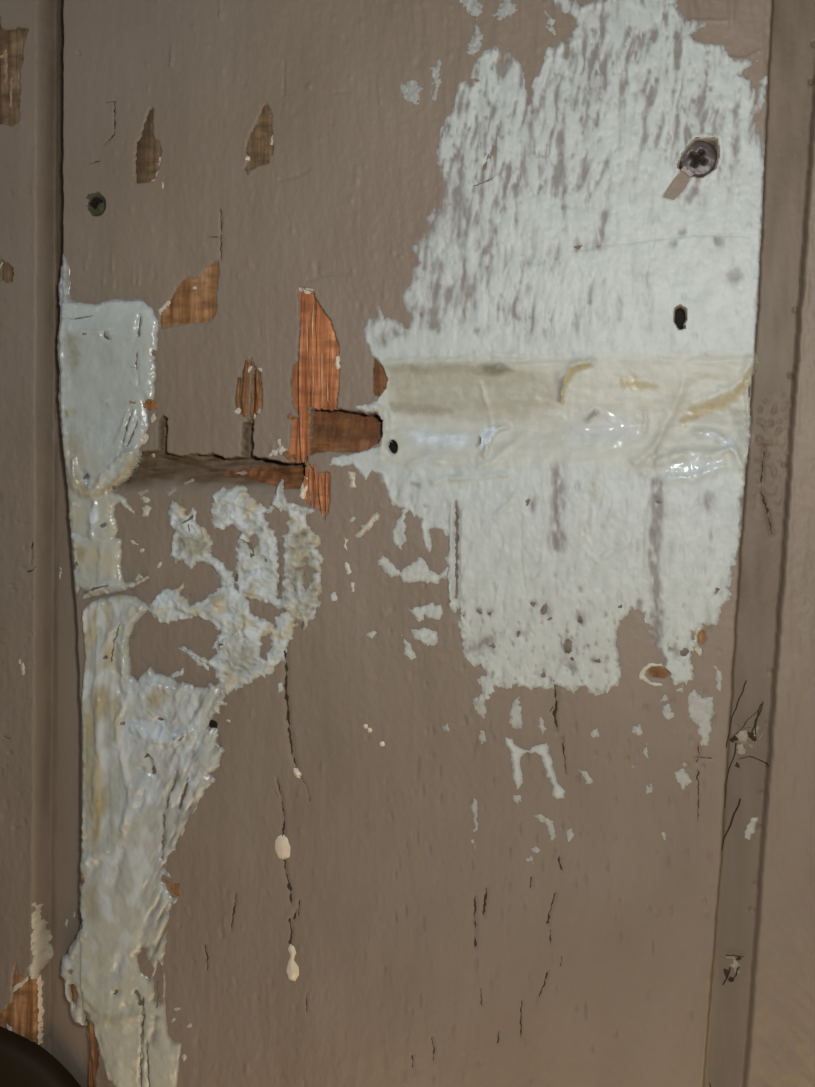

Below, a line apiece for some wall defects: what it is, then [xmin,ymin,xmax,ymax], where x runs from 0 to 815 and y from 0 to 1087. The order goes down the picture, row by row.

peeling [459,0,518,56]
peeling [0,24,29,127]
peeling [136,108,164,189]
peeling [245,105,274,175]
peeling [158,262,219,328]
peeling [373,359,387,396]
peeling [272,478,317,513]
peeling [377,556,450,584]
peeling [401,603,443,660]
peeling [639,663,722,746]
crack [275,650,310,944]
peeling [0,966,45,1046]